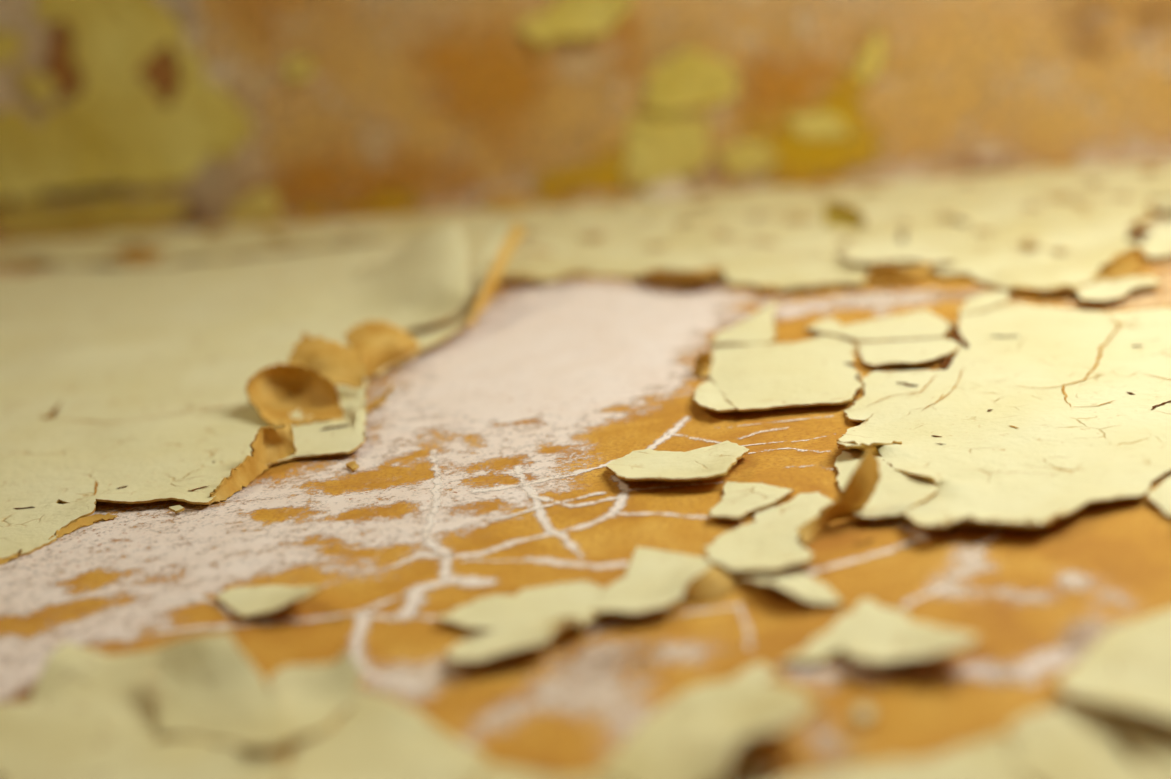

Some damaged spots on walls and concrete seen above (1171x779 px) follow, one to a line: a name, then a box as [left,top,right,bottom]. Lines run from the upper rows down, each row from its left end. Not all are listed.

peeling [0,0,254,201]
peeling [520,0,632,48]
peeling [0,49,1171,664]
crack [647,321,1018,471]
crack [1014,314,1171,410]
crack [154,449,754,693]
crack [806,520,1003,575]
crack [900,584,952,608]
peeling [0,599,980,779]
peeling [787,609,1171,779]